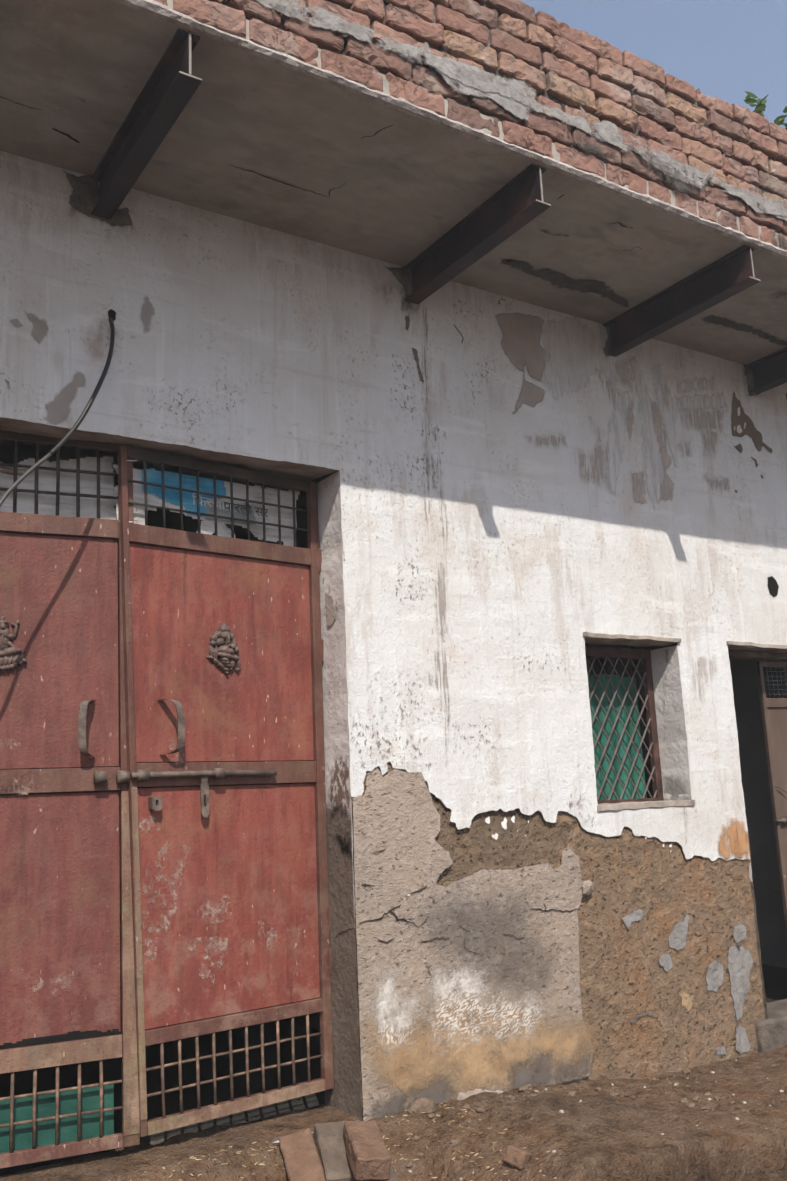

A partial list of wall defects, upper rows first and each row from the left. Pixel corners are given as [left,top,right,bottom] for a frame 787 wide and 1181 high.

crack [227,164,345,197]
peeling [47,373,85,425]
peeling [496,299,550,414]
peeling [652,386,674,500]
peeling [689,392,773,478]
leakage [435,571,447,634]
leakage [429,652,449,703]
flaking render [326,722,765,1121]